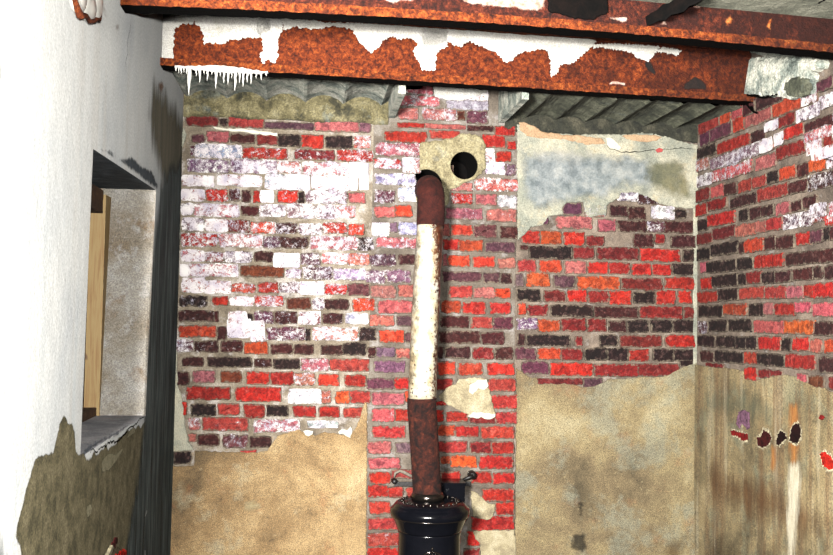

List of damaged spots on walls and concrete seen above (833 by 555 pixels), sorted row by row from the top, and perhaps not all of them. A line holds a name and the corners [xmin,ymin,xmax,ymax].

rust [684,77,706,89]
water stain [796,90,833,123]
water stain [696,118,784,187]
water stain [804,118,833,190]
spalling [514,56,833,392]
water stain [783,202,833,229]
water stain [123,86,421,555]
spalling [173,116,377,466]
peeling [469,379,489,394]
spalling [731,410,802,450]
peeling [16,416,144,555]
water stain [780,464,803,555]